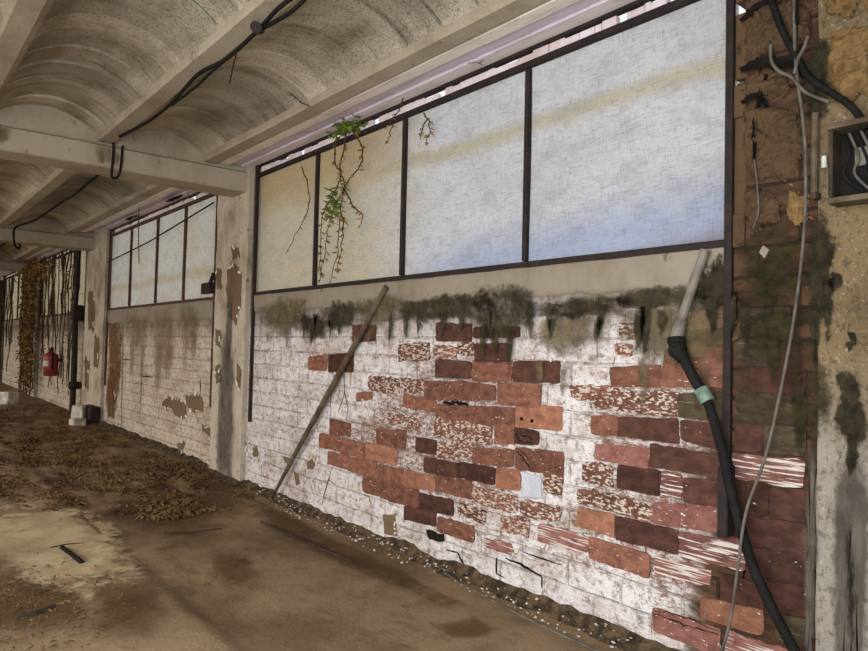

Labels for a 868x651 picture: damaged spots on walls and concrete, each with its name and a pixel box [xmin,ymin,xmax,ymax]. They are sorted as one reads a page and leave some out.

peeling [215,245,241,325]
damp [260,254,750,410]
damp [808,275,842,367]
peeling [106,376,117,421]
peeling [162,392,204,420]
damp [0,302,236,628]
peeling [256,295,809,651]